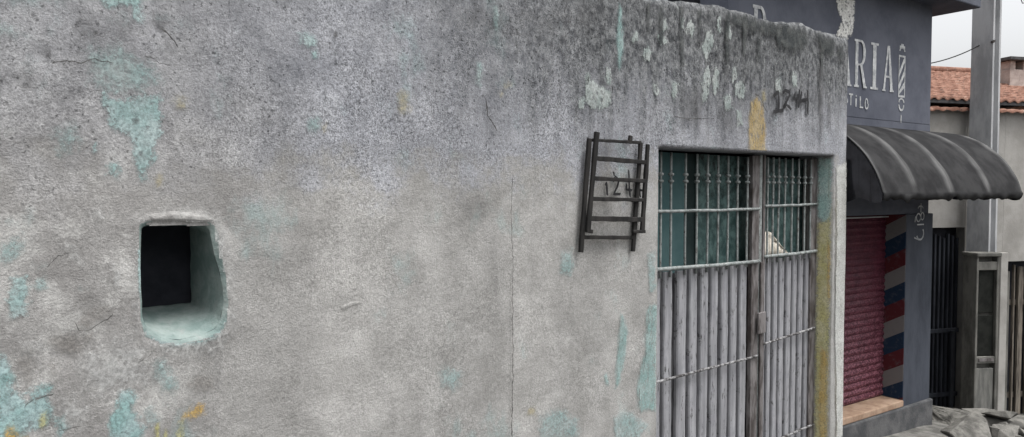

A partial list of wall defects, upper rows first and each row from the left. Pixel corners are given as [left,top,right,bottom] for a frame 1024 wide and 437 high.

peeling [79,47,164,180]
peeling [579,7,747,127]
damp [726,12,843,76]
peeling [775,71,797,92]
peeling [836,0,855,38]
crack [508,180,516,435]
peeling [0,354,81,437]
peeling [82,346,156,437]
peeling [614,306,657,437]